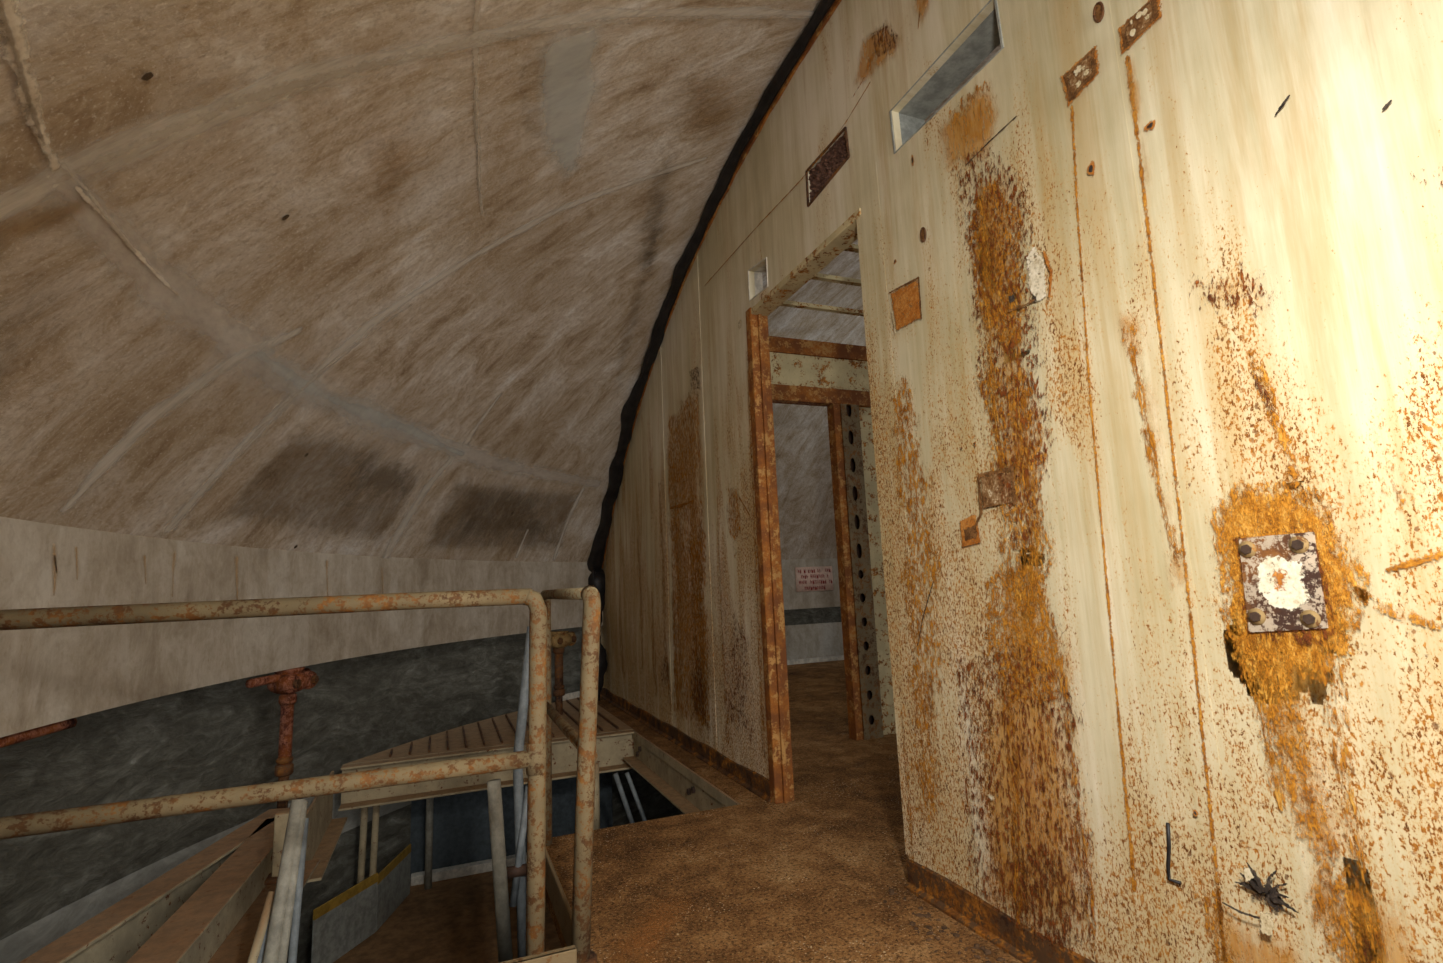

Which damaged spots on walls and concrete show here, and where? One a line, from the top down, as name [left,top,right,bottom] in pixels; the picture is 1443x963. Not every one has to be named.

damp [0,7,814,560]
rust [637,359,765,759]
rust [853,25,898,97]
rust [889,81,1098,958]
rust [1070,105,1137,892]
rust [1122,55,1294,963]
rust [1209,351,1443,963]